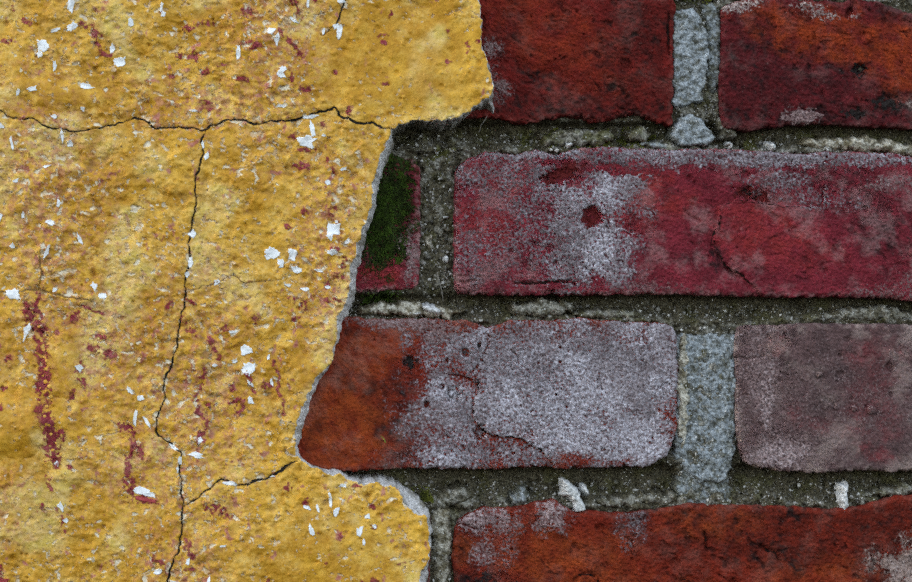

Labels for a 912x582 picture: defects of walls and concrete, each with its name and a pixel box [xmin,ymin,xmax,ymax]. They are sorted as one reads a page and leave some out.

spalling [851,60,867,79]
spalling [541,157,586,186]
spalling [581,203,603,230]
peeling [264,246,302,274]
leakage [398,220,420,286]
spalling [295,0,495,582]
crack [0,106,390,582]
peeling [558,477,589,512]